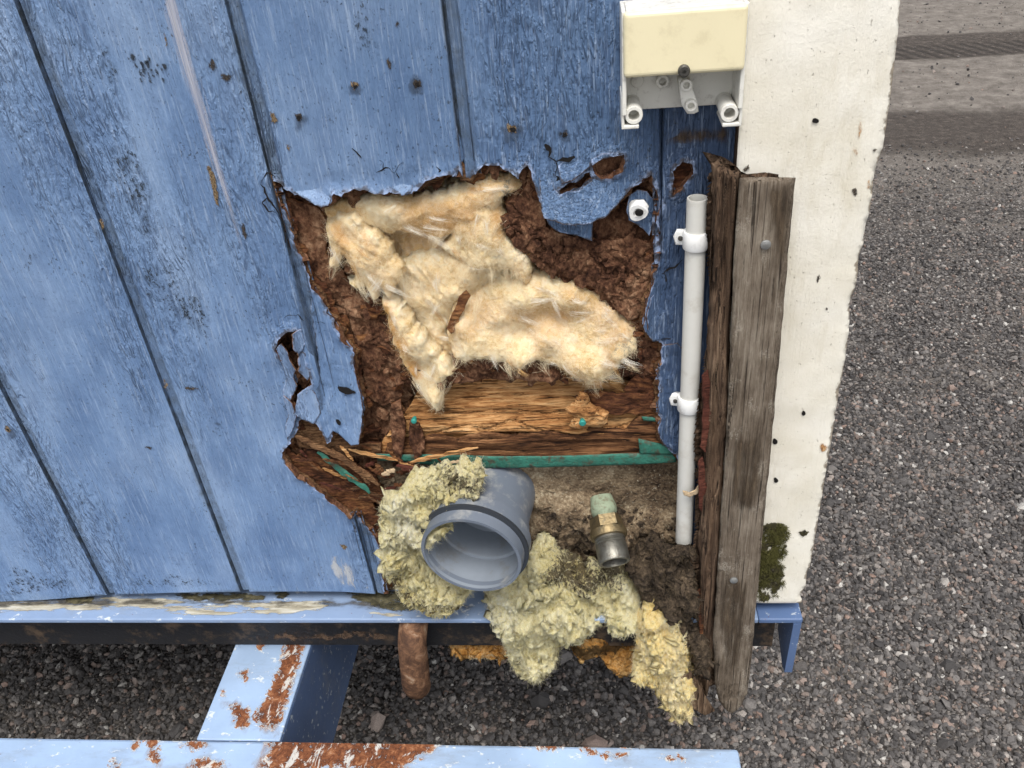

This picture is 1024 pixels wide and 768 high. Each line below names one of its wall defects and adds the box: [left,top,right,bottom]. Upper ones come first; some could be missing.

peeling [394,184,413,196]
spalling [673,162,692,190]
peeling [500,150,682,453]
peeling [276,188,425,526]
peeling [0,597,329,615]
rust [220,631,439,768]
rust [107,740,162,768]
rust [179,741,226,768]